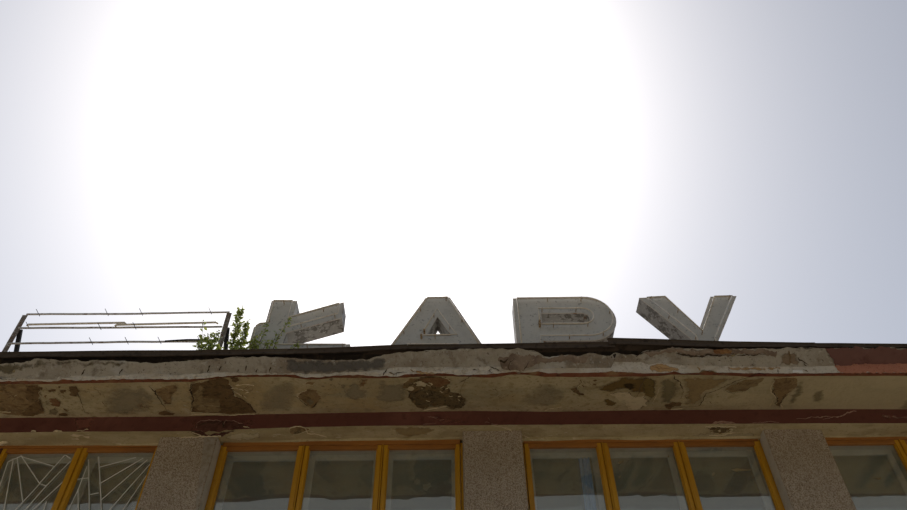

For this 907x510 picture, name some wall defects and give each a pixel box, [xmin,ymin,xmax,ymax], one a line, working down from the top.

flaking render [498,353,589,374]
flaking render [644,347,777,358]
flaking render [0,384,79,417]
flaking render [181,377,256,438]
flaking render [402,376,466,425]
flaking render [749,369,808,407]